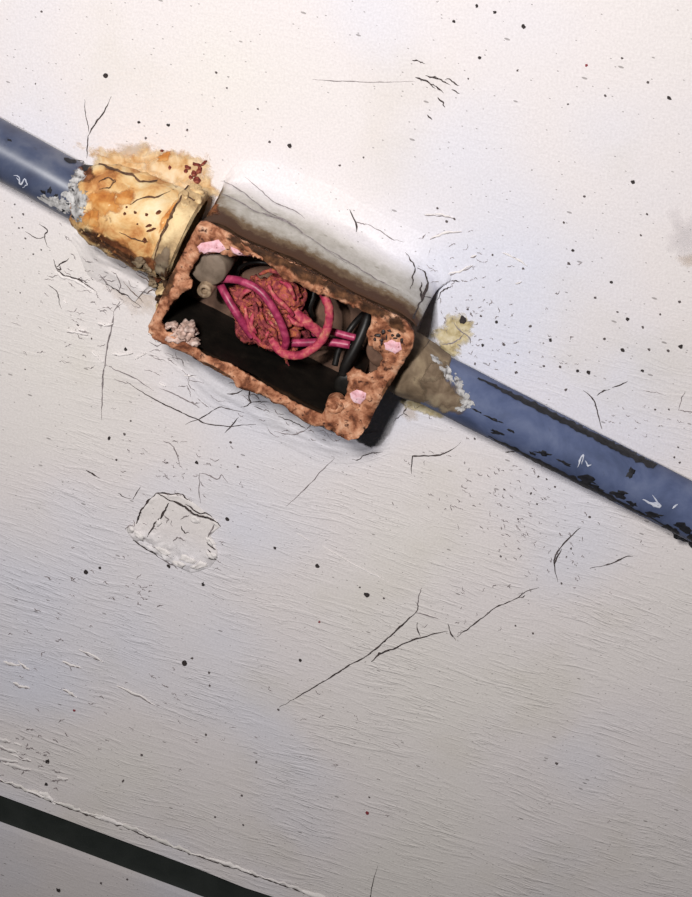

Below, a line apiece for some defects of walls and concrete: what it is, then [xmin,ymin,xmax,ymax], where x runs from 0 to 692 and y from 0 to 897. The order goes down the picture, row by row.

crack [314,77,412,85]
crack [84,99,110,154]
rust [95,144,219,215]
crack [28,225,311,435]
crack [280,528,580,707]